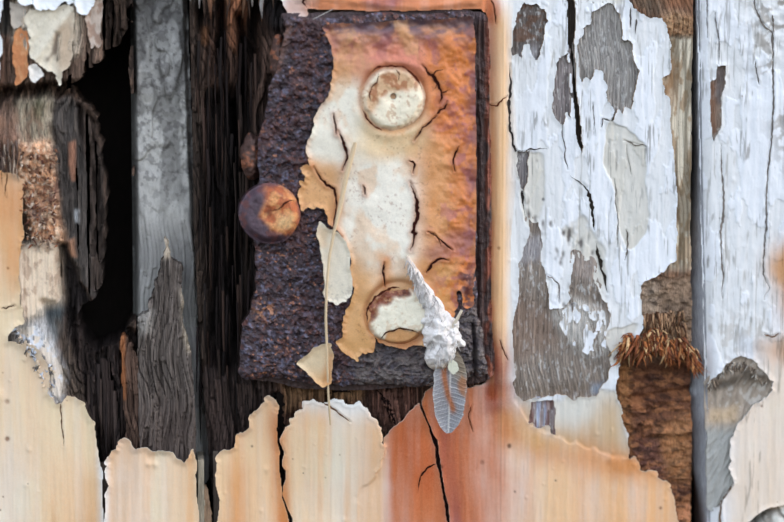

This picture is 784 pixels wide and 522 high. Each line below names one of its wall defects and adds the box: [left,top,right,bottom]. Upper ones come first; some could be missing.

peeling [12,328,56,399]
spalling [10,0,133,339]
rust [245,377,425,390]
rust [281,9,498,384]
crack [418,410,449,522]
peeling [511,0,773,522]